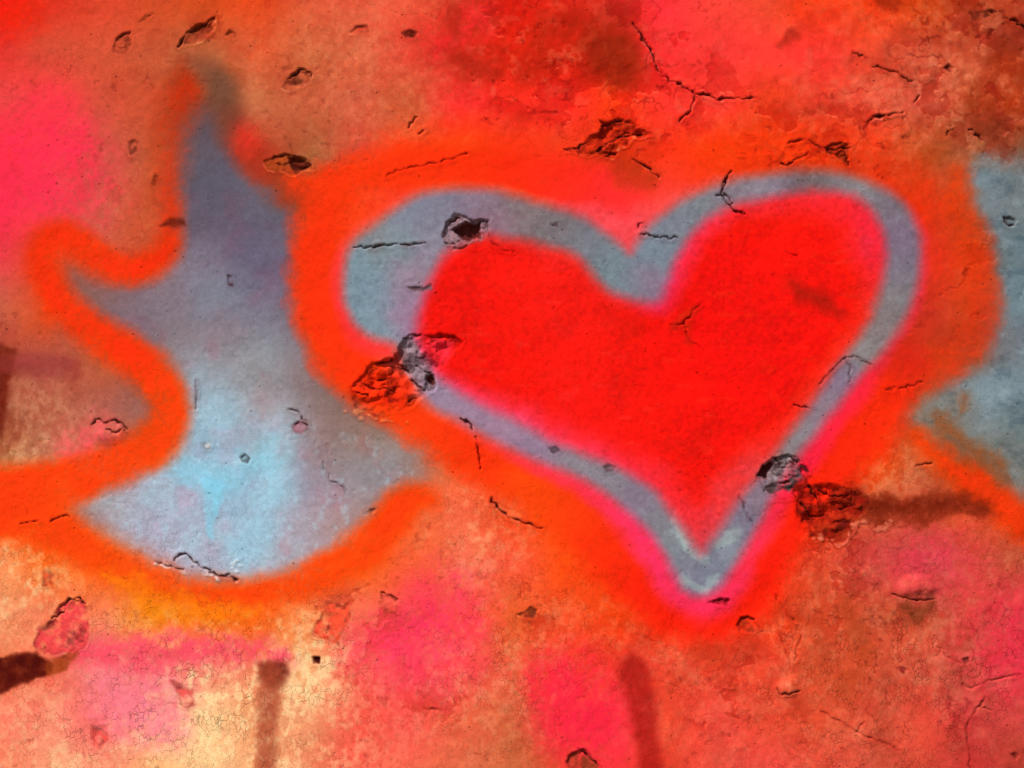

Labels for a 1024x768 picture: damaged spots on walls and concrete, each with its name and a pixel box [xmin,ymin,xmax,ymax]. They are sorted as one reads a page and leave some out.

crack [630,20,761,124]
spalling [261,150,317,179]
crack [384,114,473,181]
spalling [563,114,655,161]
crack [715,169,748,219]
crack [352,239,430,252]
spalling [438,210,494,254]
spalling [343,330,467,425]
crack [460,415,546,533]
spalling [753,451,894,548]
crack [152,550,242,586]
spalling [30,594,93,658]